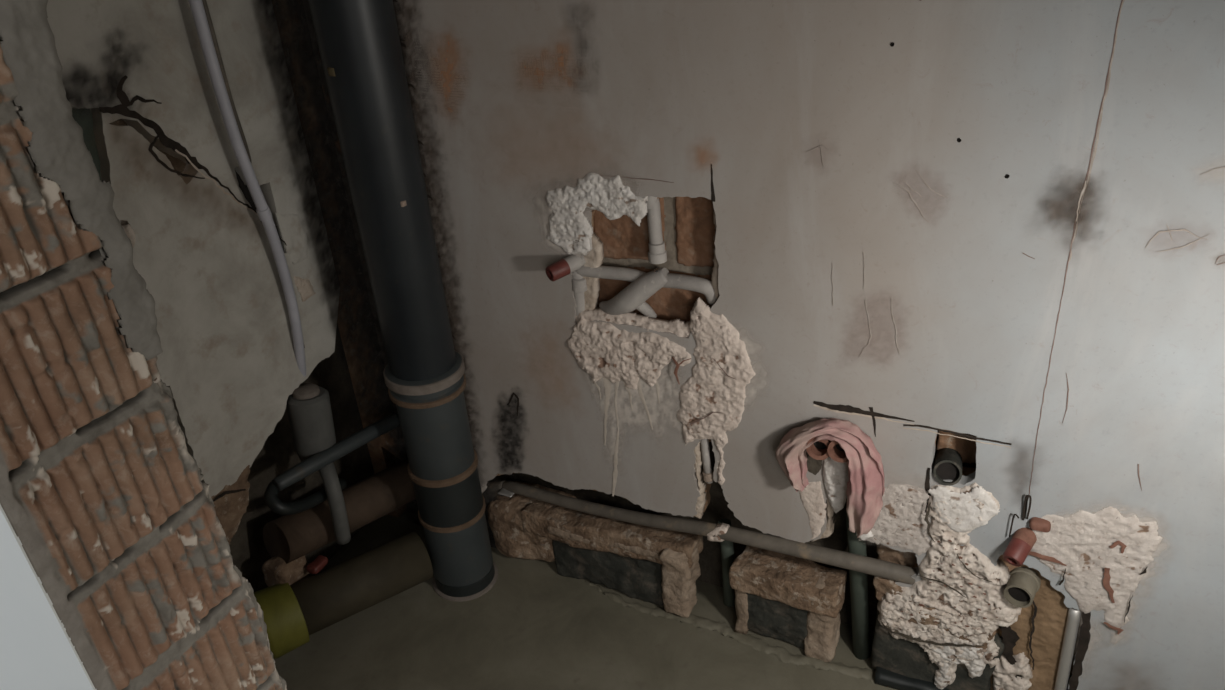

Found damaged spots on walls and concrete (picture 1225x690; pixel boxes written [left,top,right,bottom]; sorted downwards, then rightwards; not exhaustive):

crack [99,75,287,246]
crack [1024,0,1125,518]
flaking render [0,0,287,690]
damp [498,392,523,471]
crack [868,407,876,437]
flaking render [811,499,835,542]
flaking render [856,428,1166,690]